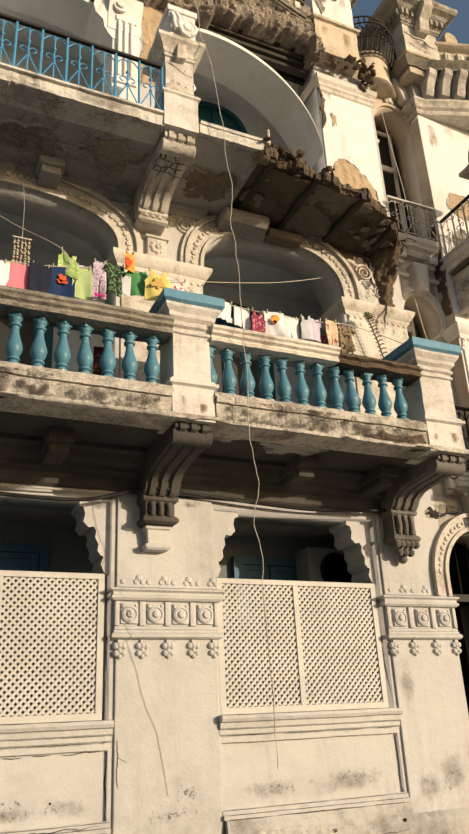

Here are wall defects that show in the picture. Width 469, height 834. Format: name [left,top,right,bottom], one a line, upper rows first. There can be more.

peeling [140,5,164,90]
flaking render [181,166,237,203]
spalling [333,158,393,212]
spalling [446,192,469,247]
flaking render [335,247,369,281]
peeling [428,221,452,316]
water stain [0,366,161,411]
crack [0,736,125,834]
crack [229,721,405,821]